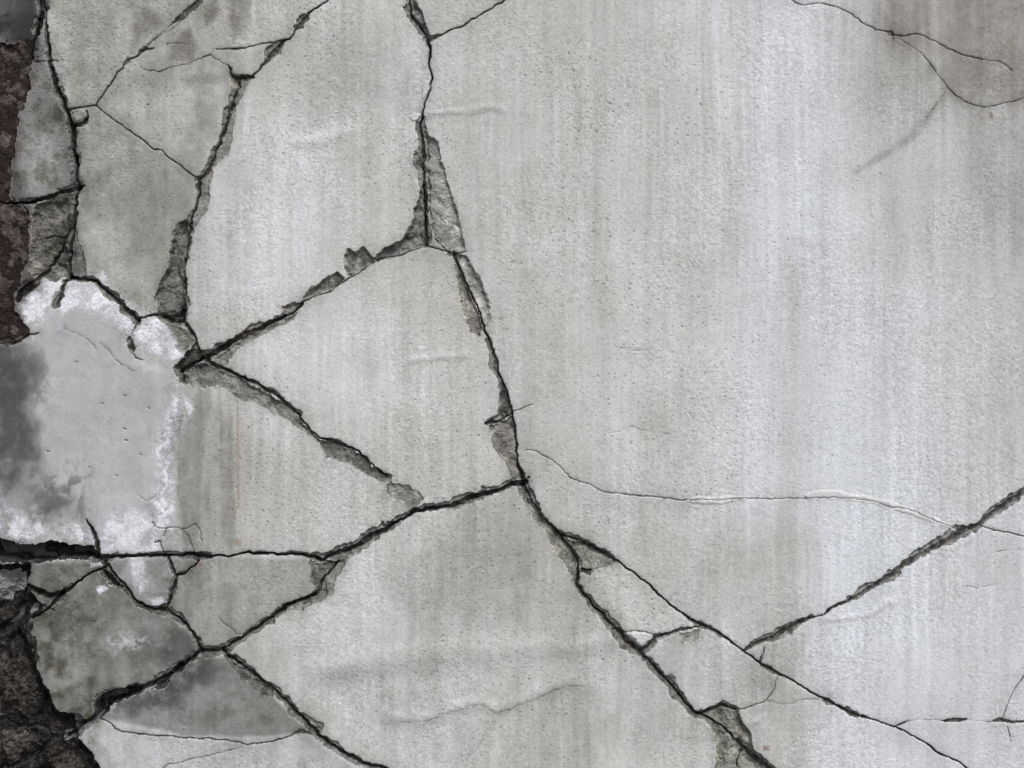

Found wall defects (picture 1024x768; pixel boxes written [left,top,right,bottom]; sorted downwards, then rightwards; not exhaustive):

crack [792,0,1024,119]
peeling [0,38,87,346]
leakage [21,271,183,360]
crack [0,0,505,476]
flaking render [273,123,492,338]
leakage [0,385,193,591]
crack [0,238,1024,768]
flaking render [0,538,99,768]